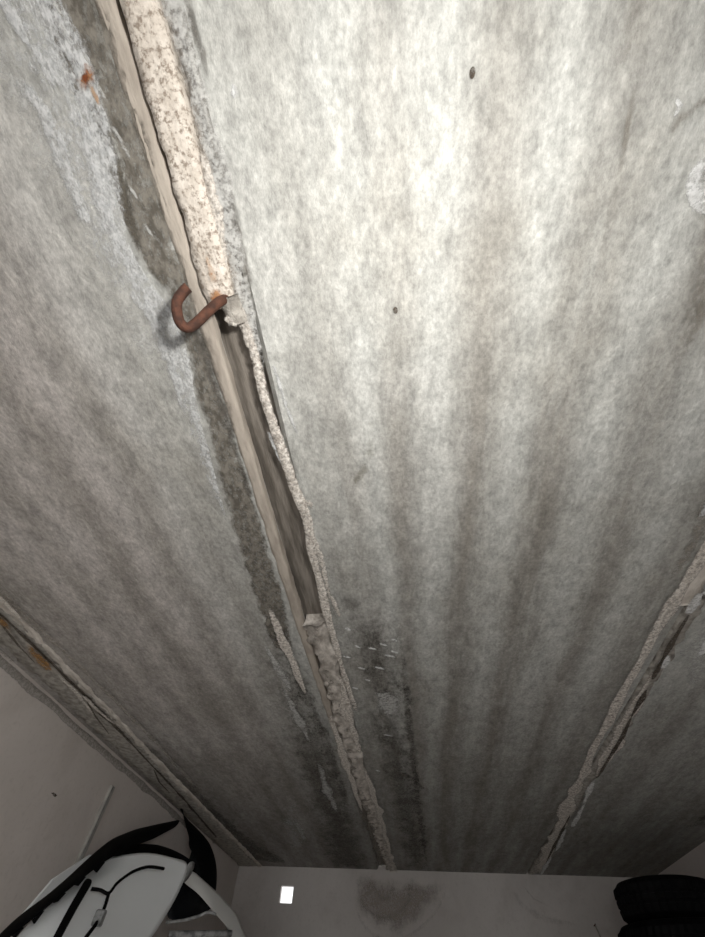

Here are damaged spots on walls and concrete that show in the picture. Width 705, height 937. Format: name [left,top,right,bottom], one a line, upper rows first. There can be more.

peeling [201,153,227,266]
crack [0,613,216,837]
leakage [0,0,364,866]
peeling [221,291,392,860]
leakage [362,631,425,866]
spalling [534,505,705,875]